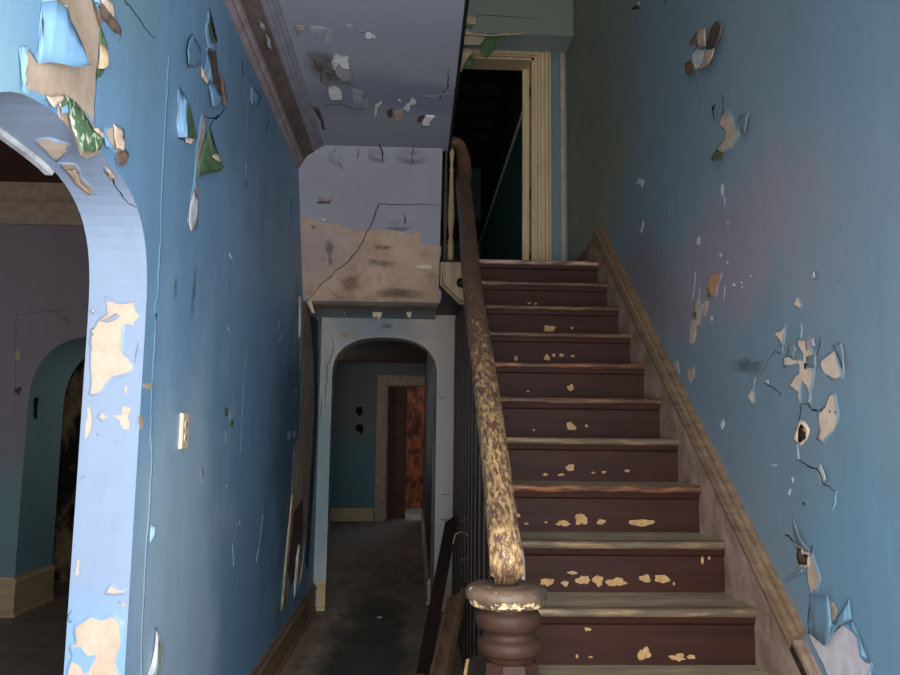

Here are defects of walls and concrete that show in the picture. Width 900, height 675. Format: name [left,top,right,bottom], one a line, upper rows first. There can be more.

peeling [18,0,130,195]
peeling [177,8,227,234]
peeling [311,53,435,130]
crack [312,202,441,300]
peeling [88,296,142,397]
flaking render [280,215,442,611]
crack [760,349,782,396]
peeling [775,323,845,460]
crack [795,460,837,511]
peeling [66,610,125,675]
peeling [148,628,164,675]
peeling [785,517,873,675]